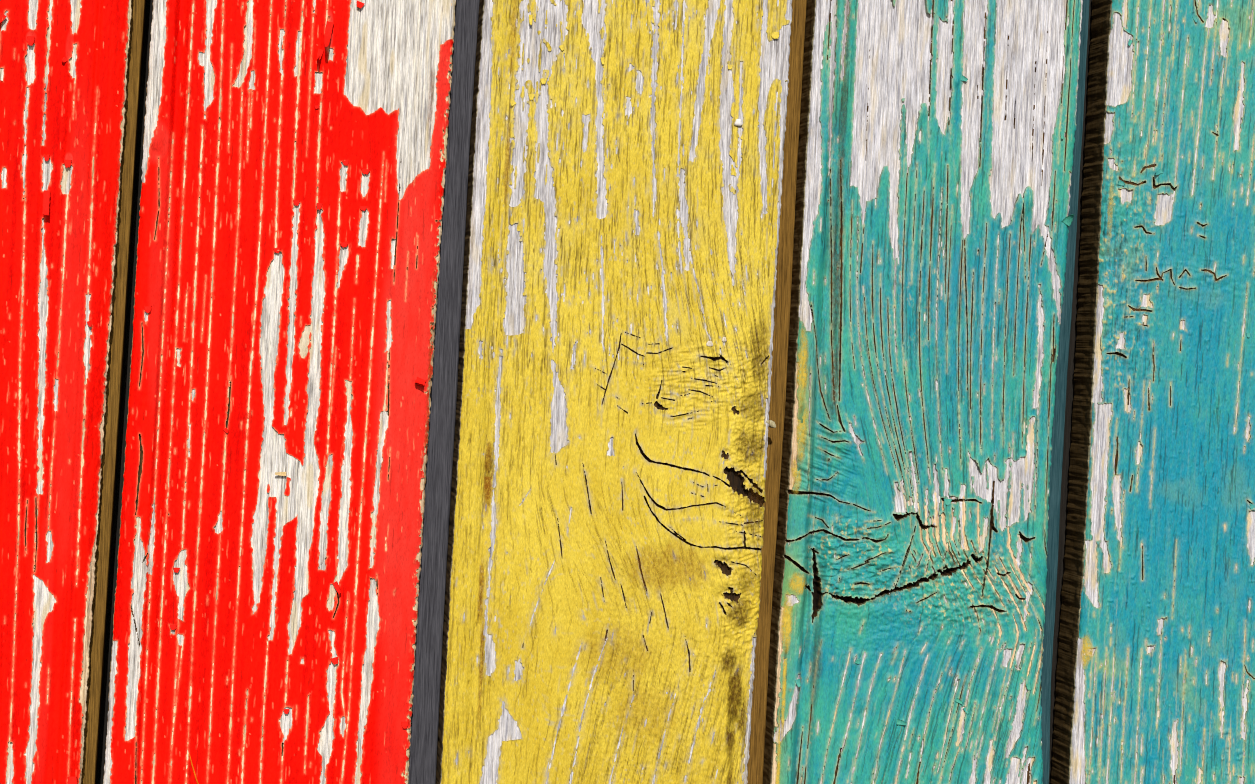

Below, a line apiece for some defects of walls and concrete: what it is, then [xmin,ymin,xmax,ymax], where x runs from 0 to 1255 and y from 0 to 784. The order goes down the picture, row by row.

peeling [250,160,370,664]
peeling [314,0,456,784]
peeling [466,0,493,329]
crack [522,455,592,648]
crack [546,541,711,784]
peeling [689,0,792,507]
peeling [799,0,837,331]
crack [595,0,1074,623]
crack [796,648,1012,784]
peeling [850,0,1083,260]
crack [1107,260,1255,577]
crack [1119,0,1253,238]